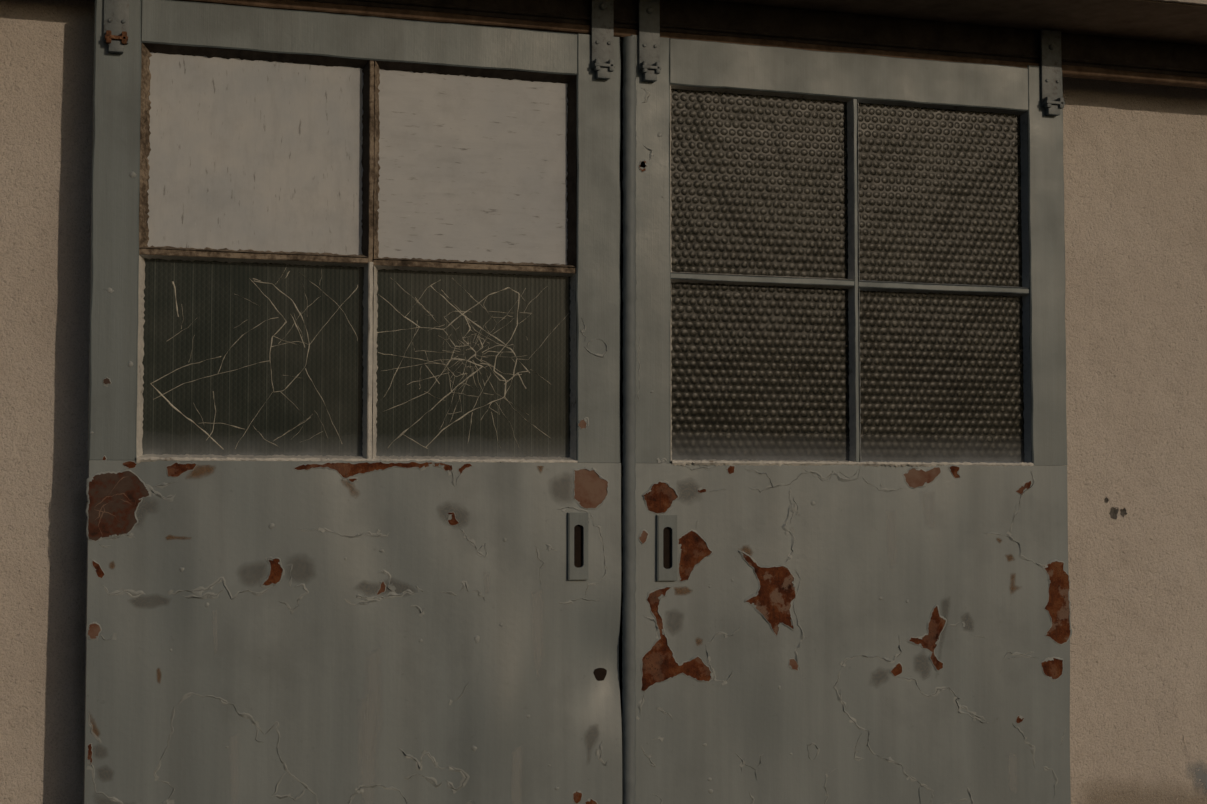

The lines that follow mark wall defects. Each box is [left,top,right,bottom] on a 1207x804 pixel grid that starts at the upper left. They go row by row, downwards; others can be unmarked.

peeling [293,460,473,484]
peeling [1015,480,1032,496]
peeling [91,559,105,579]
peeling [260,556,285,588]
peeling [889,662,903,677]
peeling [573,790,598,804]